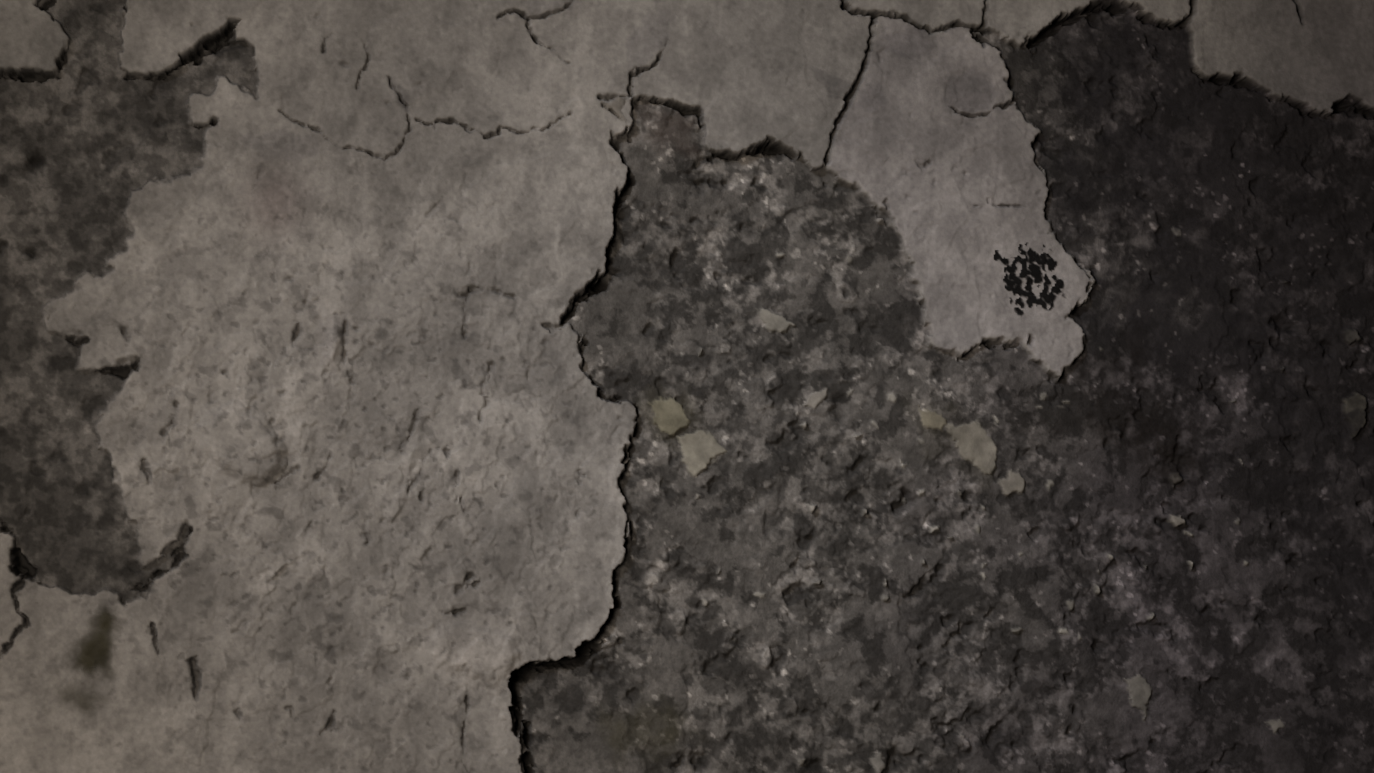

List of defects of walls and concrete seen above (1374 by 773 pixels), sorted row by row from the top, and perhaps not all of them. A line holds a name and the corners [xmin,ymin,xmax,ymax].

crack [279,34,669,165]
crack [497,0,576,65]
crack [823,0,990,170]
crack [949,101,1016,118]
spalling [0,0,260,604]
spalling [508,0,1374,773]
crack [0,580,31,662]